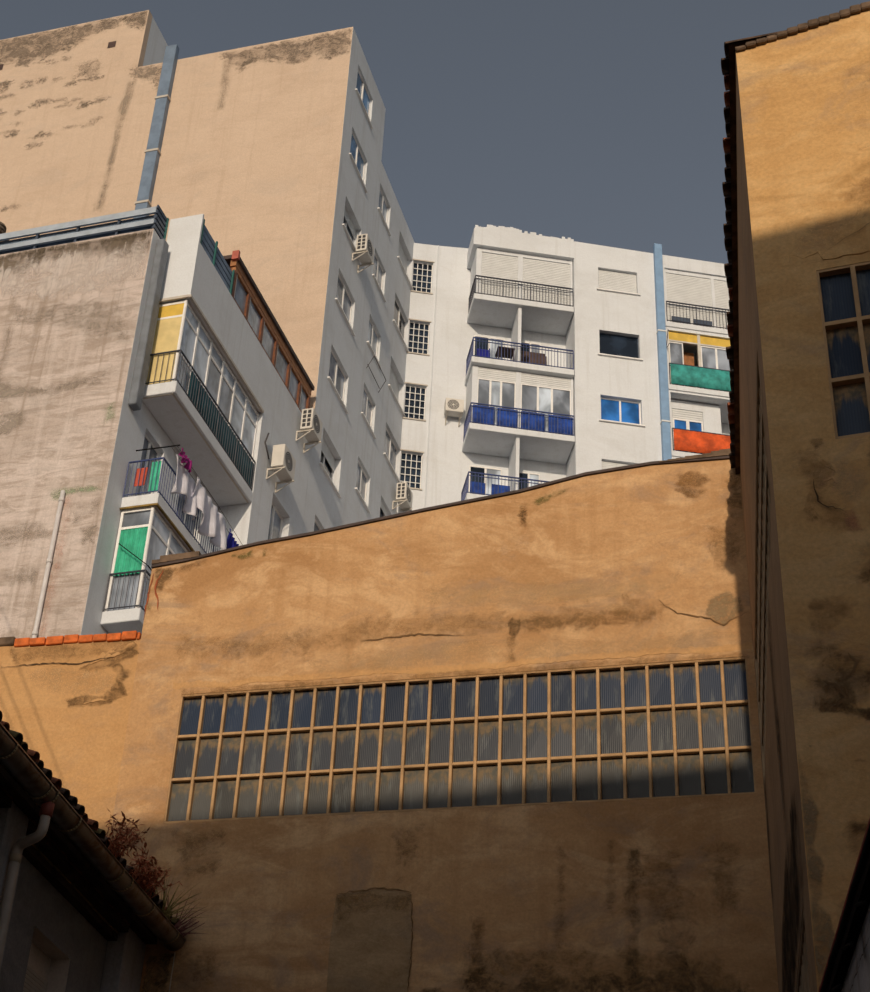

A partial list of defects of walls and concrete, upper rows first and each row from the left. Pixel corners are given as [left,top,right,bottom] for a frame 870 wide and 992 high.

crack [663,604,746,625]
leakage [770,646,800,992]